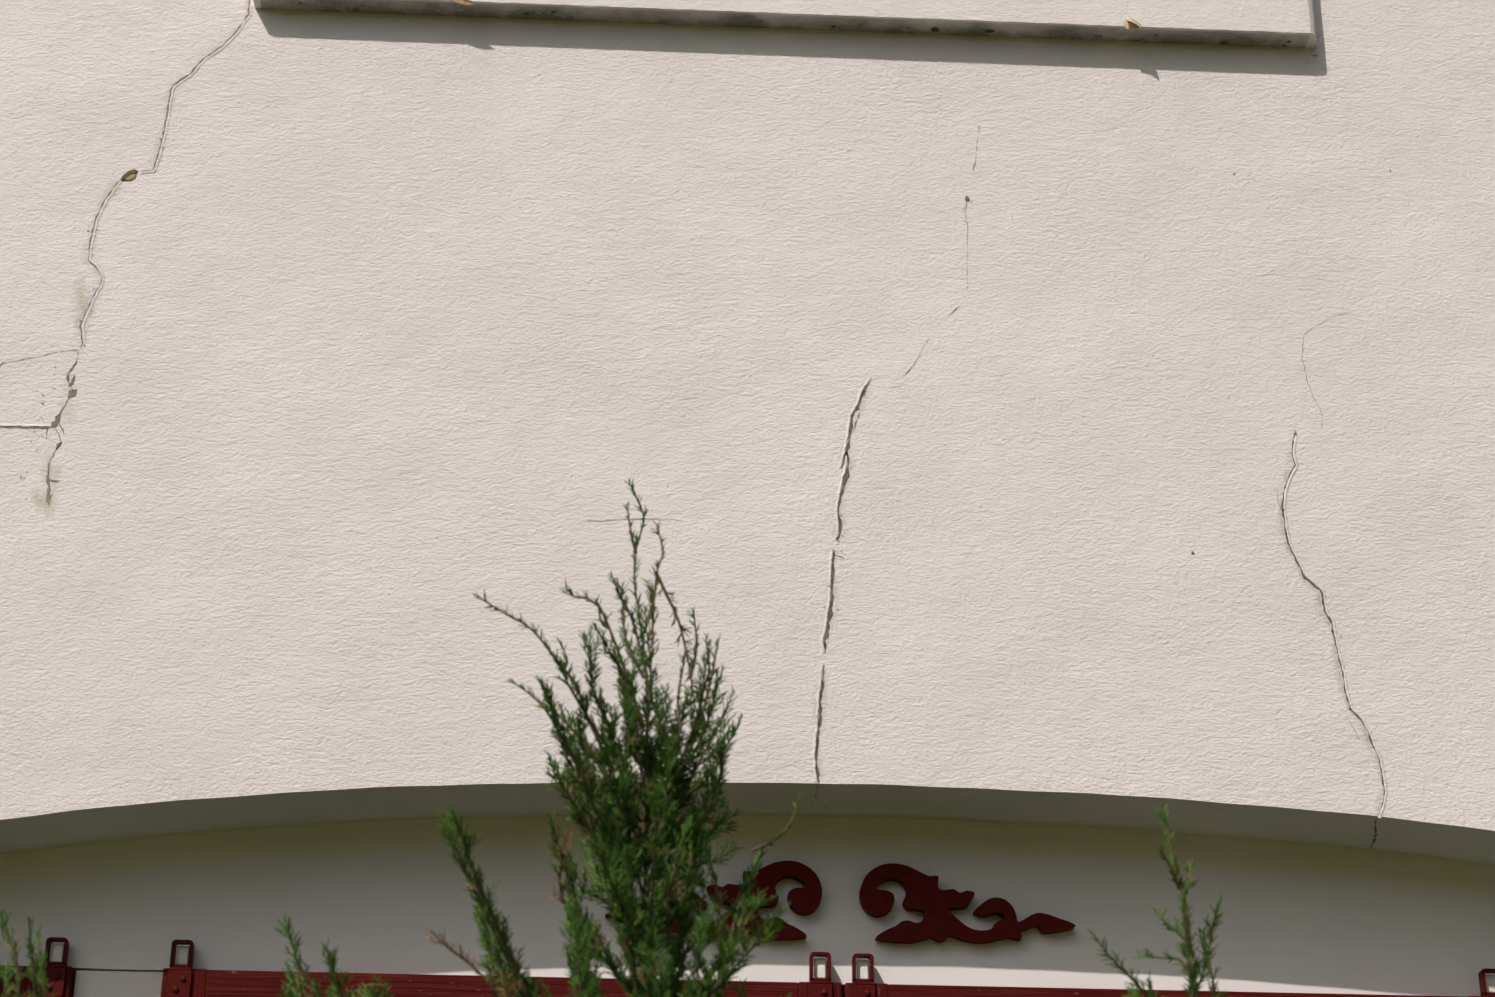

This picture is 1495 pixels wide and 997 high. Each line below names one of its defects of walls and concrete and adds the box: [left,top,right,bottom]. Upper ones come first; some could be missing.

crack [0,0,253,505]
crack [963,125,980,238]
crack [811,307,958,808]
crack [1277,312,1388,847]